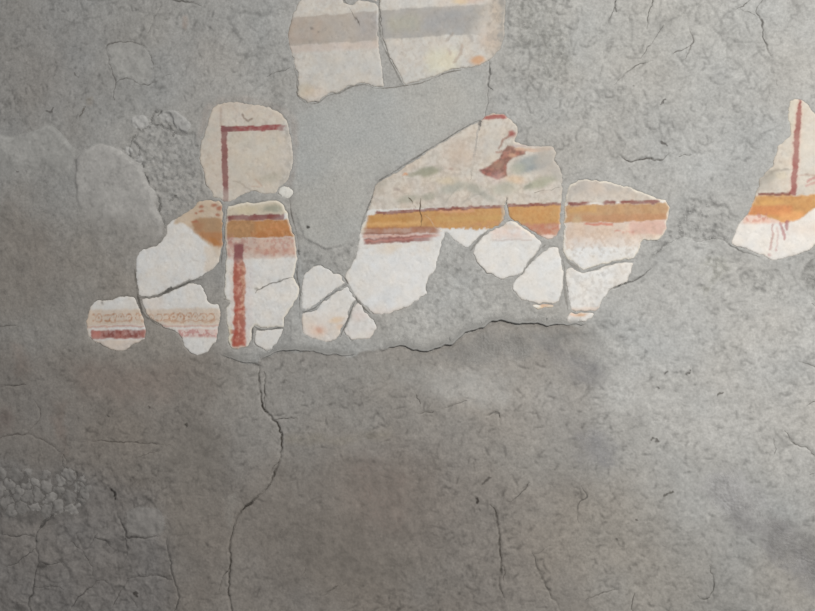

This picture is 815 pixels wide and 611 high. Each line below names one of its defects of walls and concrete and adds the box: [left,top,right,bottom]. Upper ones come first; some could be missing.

spalling [125,110,199,214]
crack [261,387,288,451]